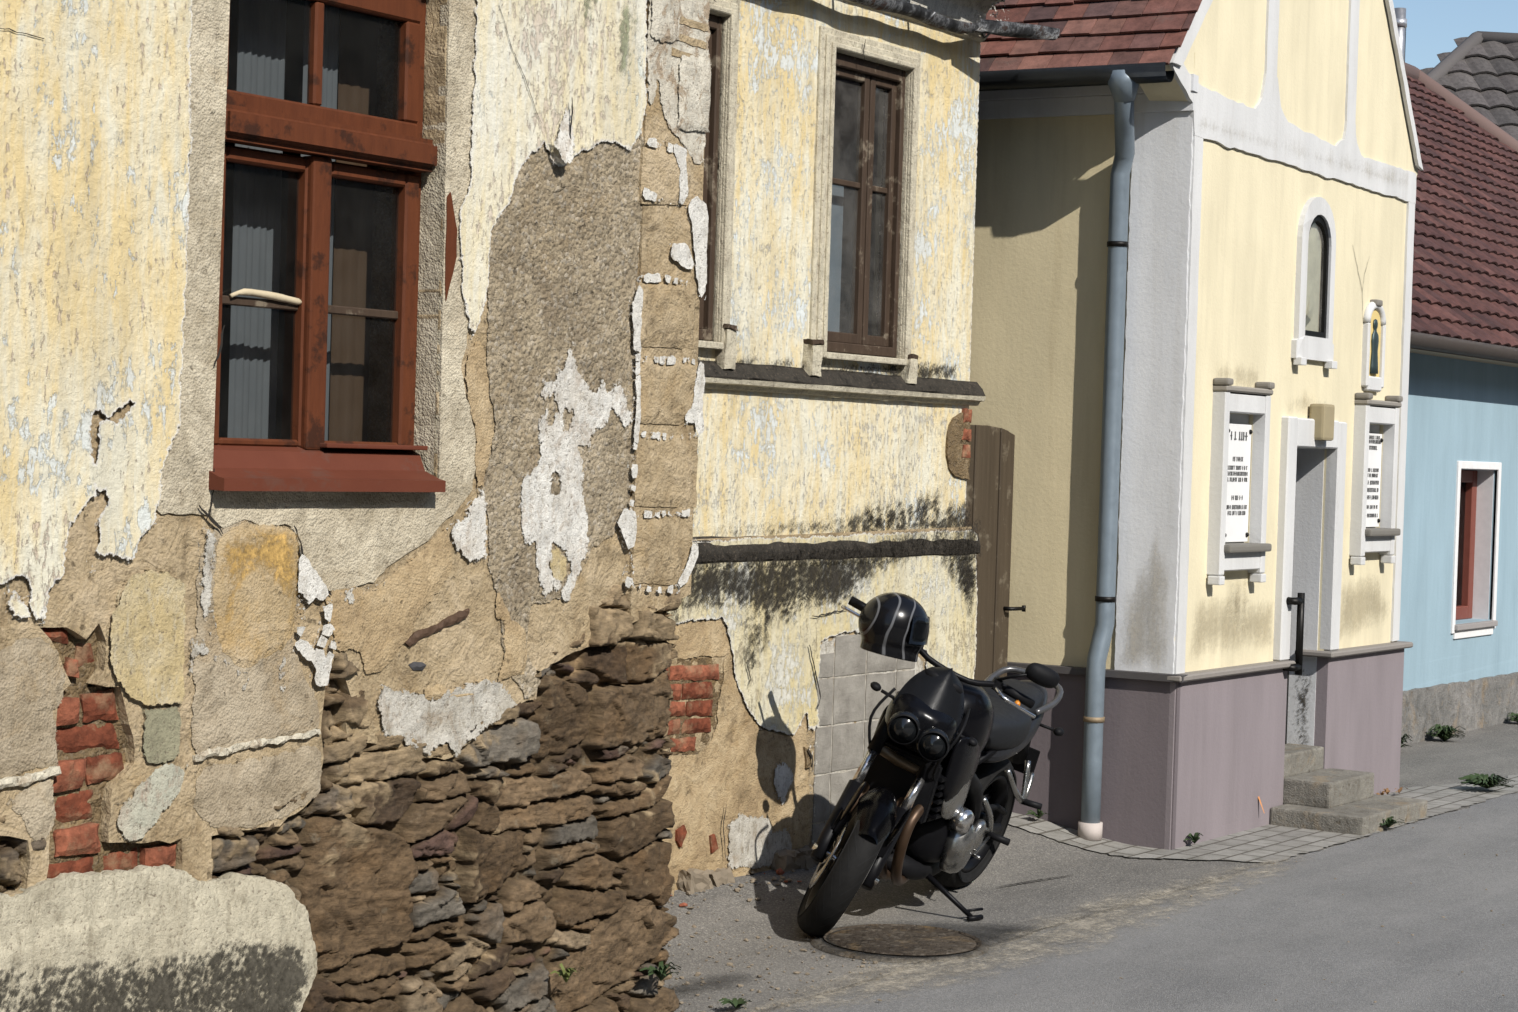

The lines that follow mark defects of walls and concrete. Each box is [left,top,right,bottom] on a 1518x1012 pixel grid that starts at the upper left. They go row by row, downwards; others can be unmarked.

spalling [374,106,709,757]
water stain [671,490,981,667]
spalling [945,408,972,480]
flaking render [40,569,249,879]
spalling [662,620,812,890]
water stain [0,941,308,1012]